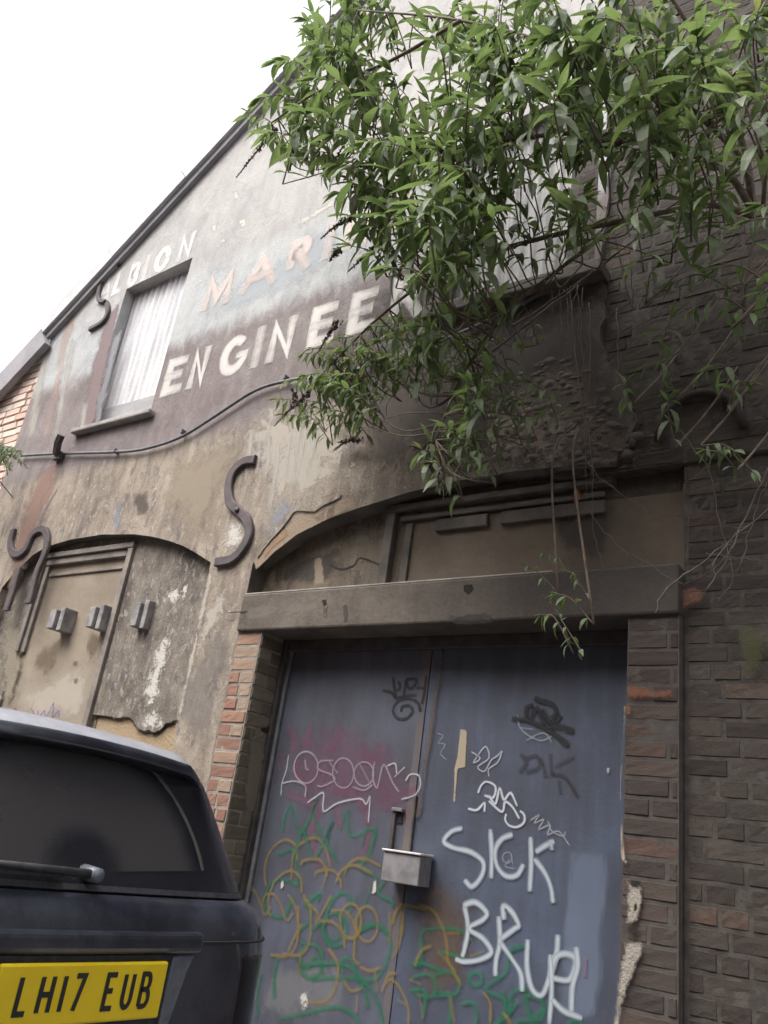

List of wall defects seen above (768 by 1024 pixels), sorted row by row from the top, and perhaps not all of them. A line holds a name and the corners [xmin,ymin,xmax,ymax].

peeling [224,523,242,552]
peeling [163,584,188,603]
peeling [199,589,225,648]
flaking render [96,629,179,752]
flaking render [614,880,642,1024]